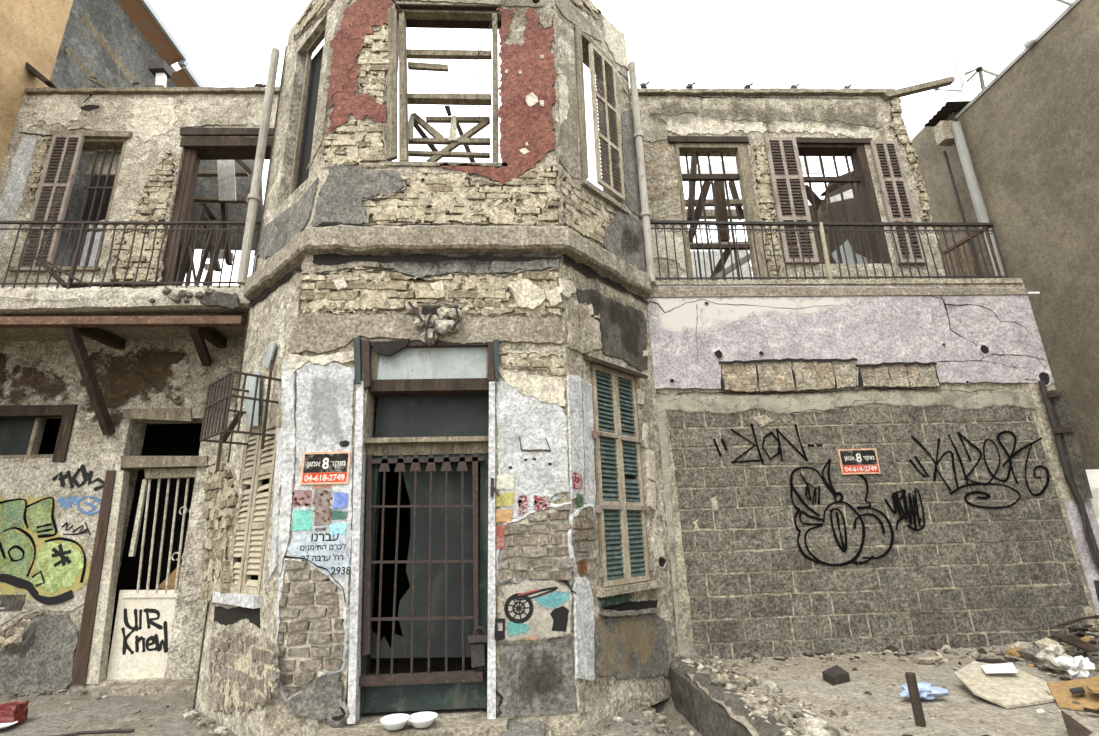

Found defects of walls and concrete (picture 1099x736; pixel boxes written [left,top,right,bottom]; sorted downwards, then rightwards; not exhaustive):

flaking render [293,0,336,41]
flaking render [570,0,602,20]
flaking render [358,24,391,104]
peeling [526,92,544,107]
flaking render [321,120,389,169]
flaking render [364,164,616,247]
leakage [0,351,97,421]
leakage [89,346,190,427]
flaking render [296,266,602,377]
crack [656,287,1051,414]
flaking render [495,502,599,591]
flaking render [208,558,350,715]